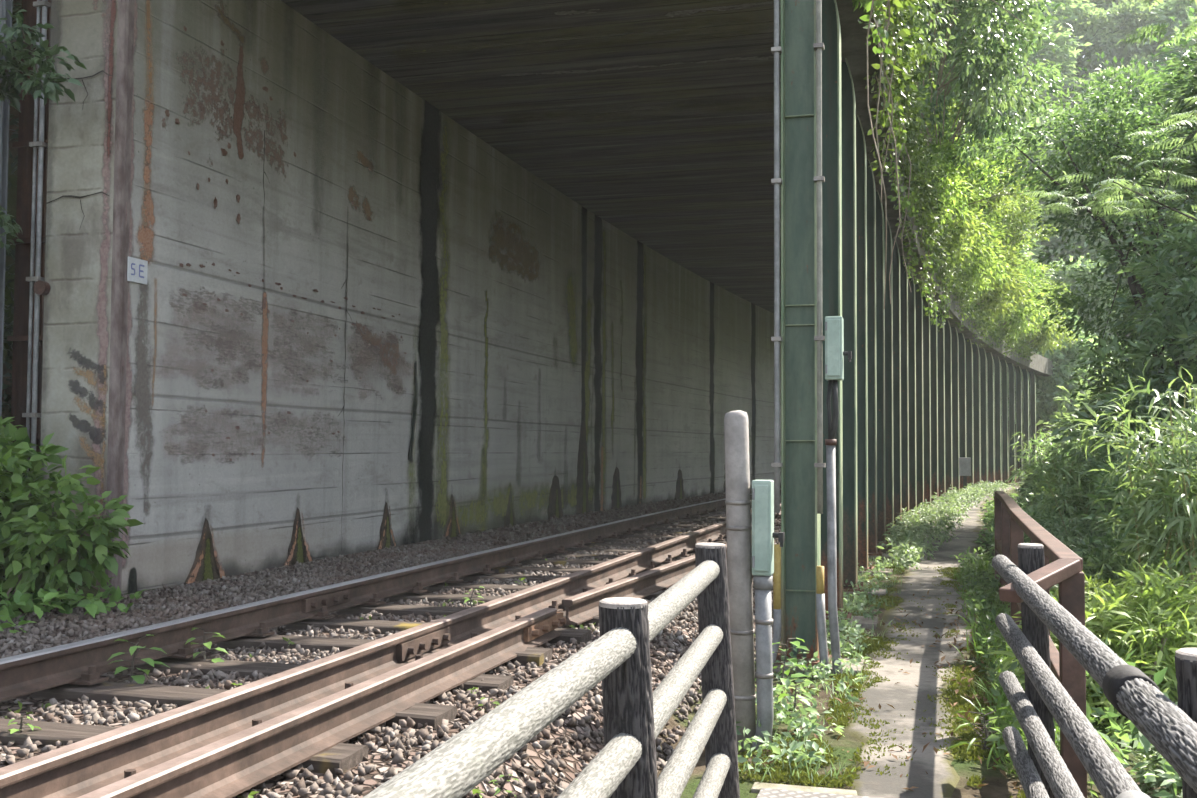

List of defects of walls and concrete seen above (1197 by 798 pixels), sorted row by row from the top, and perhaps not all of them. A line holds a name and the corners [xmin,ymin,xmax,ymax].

crack [46,191,109,228]
rust [137,0,155,263]
spalling [162,0,296,190]
rust [261,292,270,464]
peeling [229,269,406,376]
leakage [403,100,647,545]